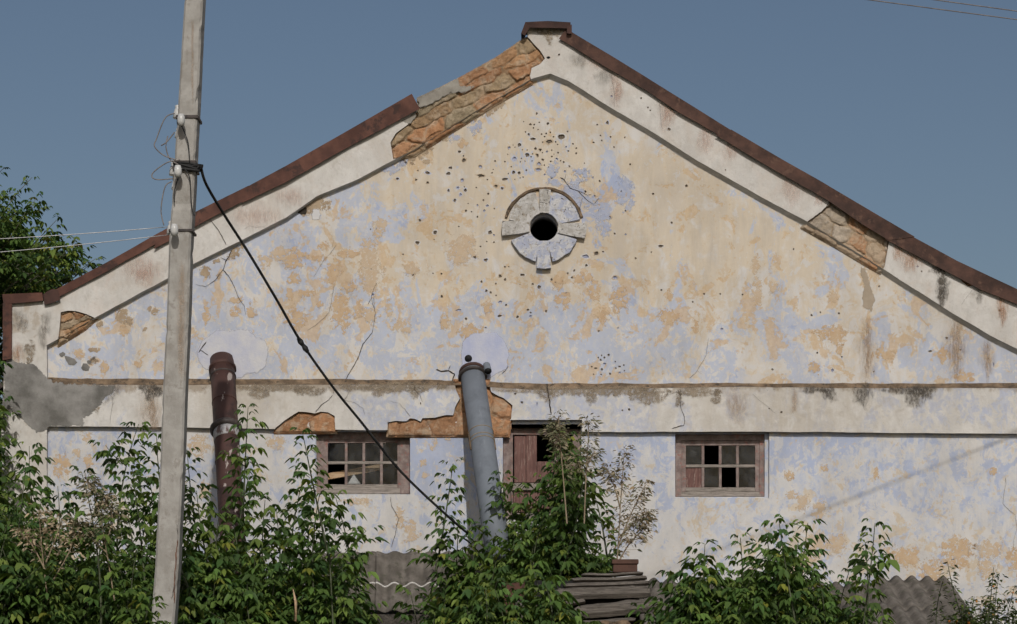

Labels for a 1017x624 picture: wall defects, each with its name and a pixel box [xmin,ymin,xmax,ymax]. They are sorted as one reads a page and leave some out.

flaking render [381,37,636,332]
flaking render [800,202,888,312]
damp [933,266,949,306]
flaking render [57,311,109,373]
crack [315,283,377,414]
flaking render [265,412,338,450]
flaking render [386,379,468,479]
flaking render [485,379,523,438]
damp [883,386,935,406]